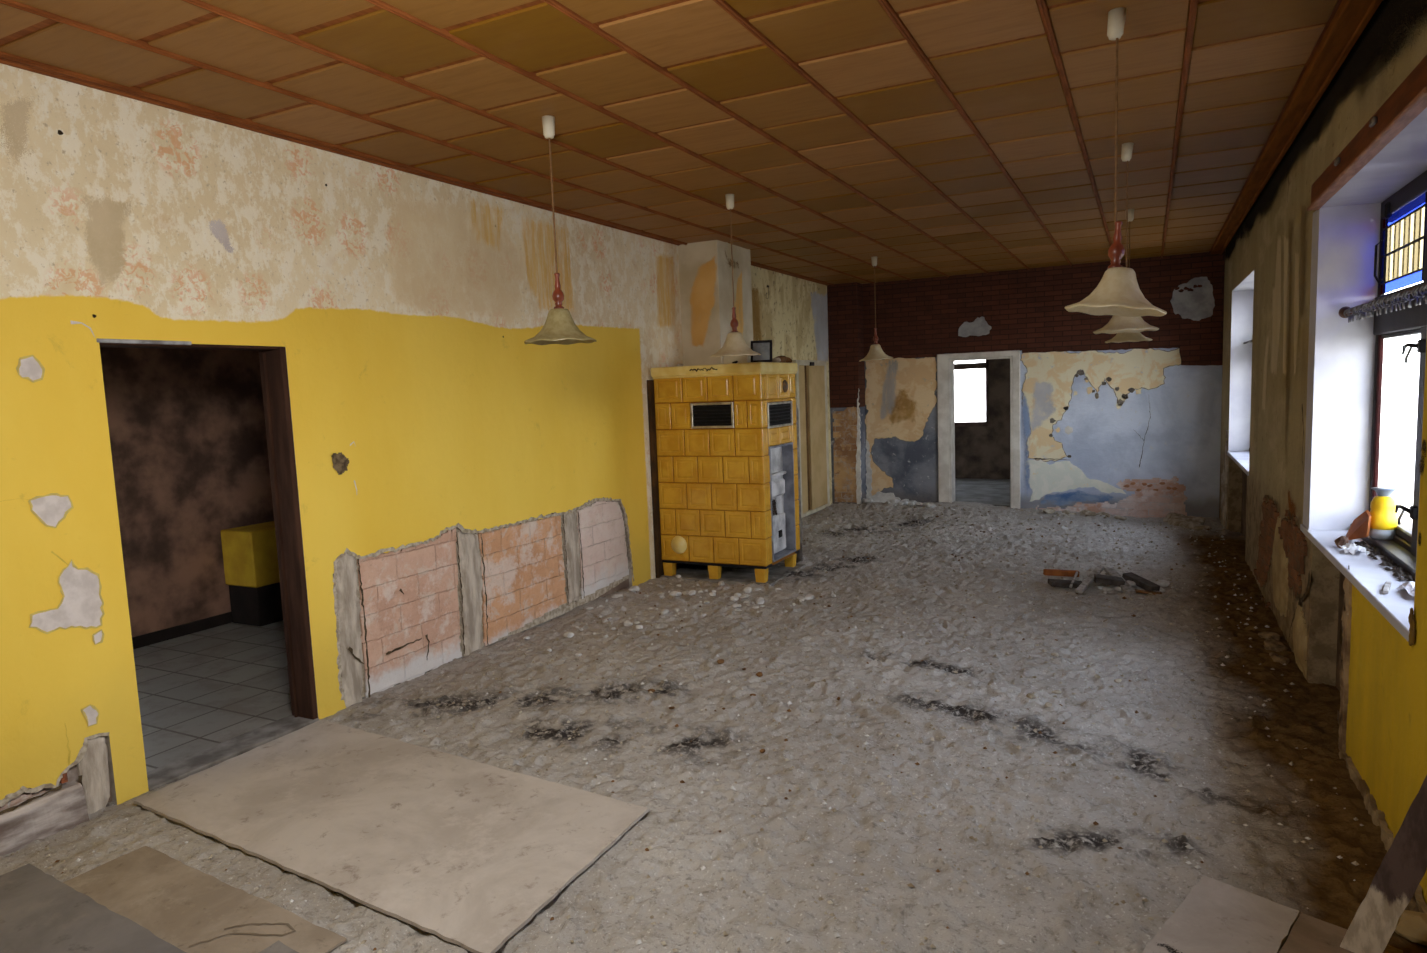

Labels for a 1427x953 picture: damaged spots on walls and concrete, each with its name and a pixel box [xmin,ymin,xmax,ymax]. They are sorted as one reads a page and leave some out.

flaking render [958,317,991,337]
flaking render [1171,277,1215,321]
peeling [856,357,937,504]
peeling [1020,348,1187,518]
peeling [28,493,74,528]
peeling [29,559,105,645]
spalling [333,497,634,708]
spalling [1253,494,1308,678]
spalling [0,704,110,856]